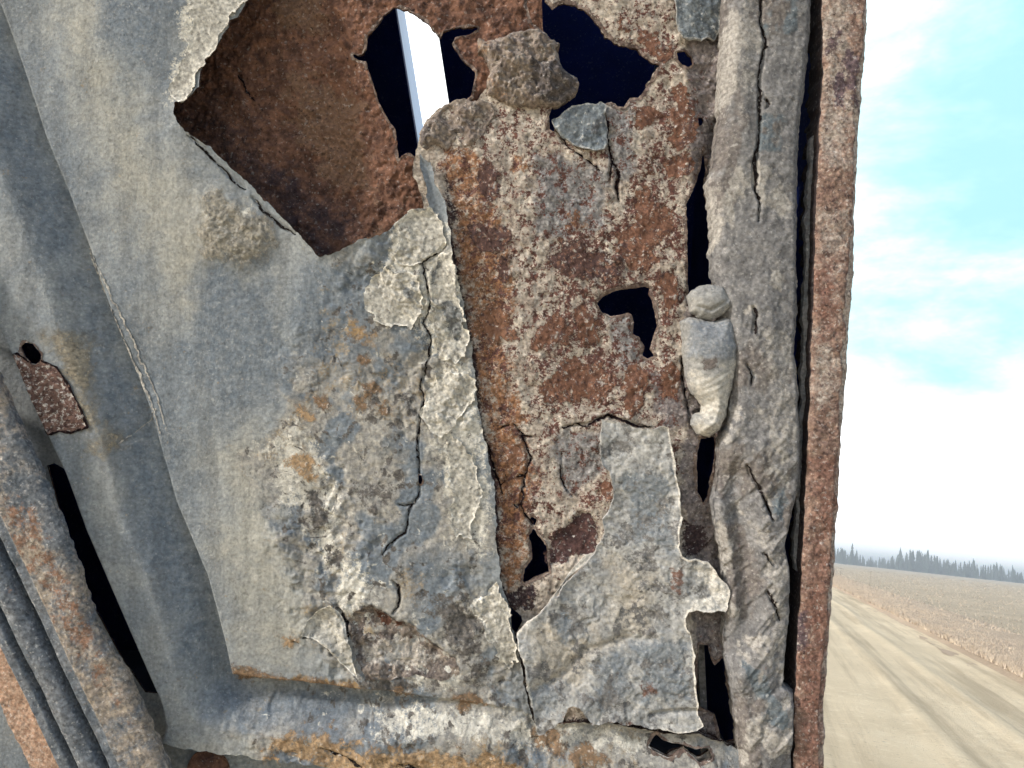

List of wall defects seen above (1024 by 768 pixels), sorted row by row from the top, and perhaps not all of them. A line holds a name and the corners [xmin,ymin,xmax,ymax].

peeling [552,101,608,151]
crack [752,0,771,221]
crack [191,136,296,235]
corrosion [475,160,502,207]
corrosion [546,82,699,317]
crack [382,253,438,556]
peeling [363,206,483,539]
crack [488,424,534,524]
corrosion [477,304,681,418]
crack [560,413,650,496]
corrosion [783,0,867,768]
spalling [539,513,598,613]